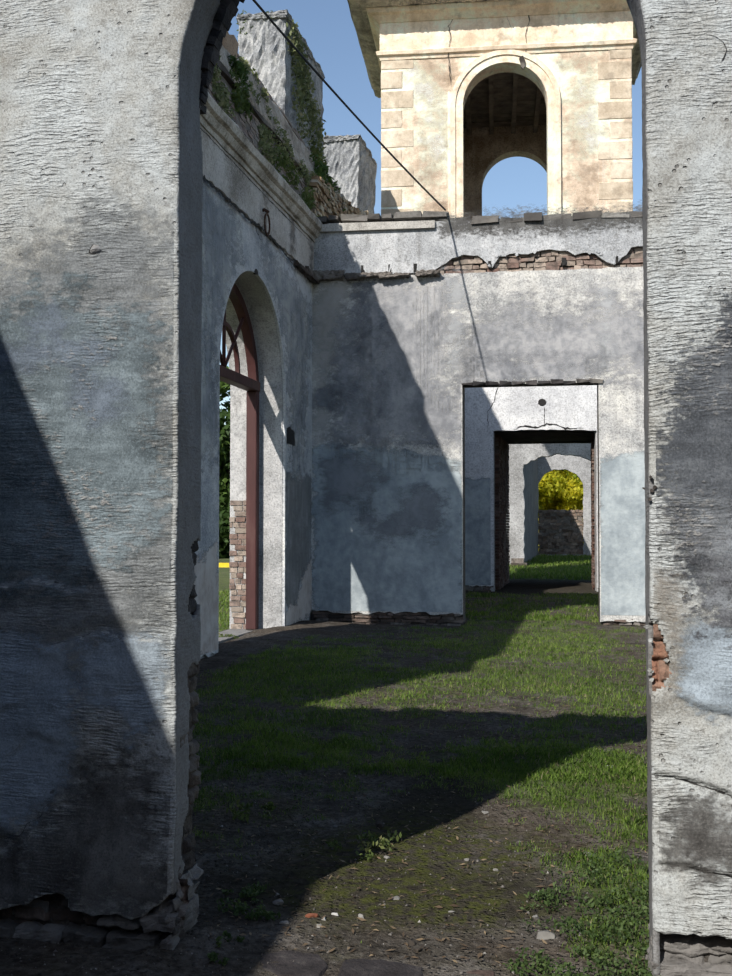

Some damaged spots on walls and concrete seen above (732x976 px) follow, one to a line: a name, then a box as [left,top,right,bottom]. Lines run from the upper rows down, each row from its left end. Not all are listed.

flaking render [199,0,245,114]
flaking render [293,247,643,284]
water stain [0,197,173,656]
water stain [260,240,644,539]
crack [517,407,577,430]
water stain [656,292,732,648]
flaking render [599,617,675,691]
flaking render [166,500,246,938]
crack [669,776,732,798]
flaking render [0,893,103,925]
flaking render [659,933,732,965]